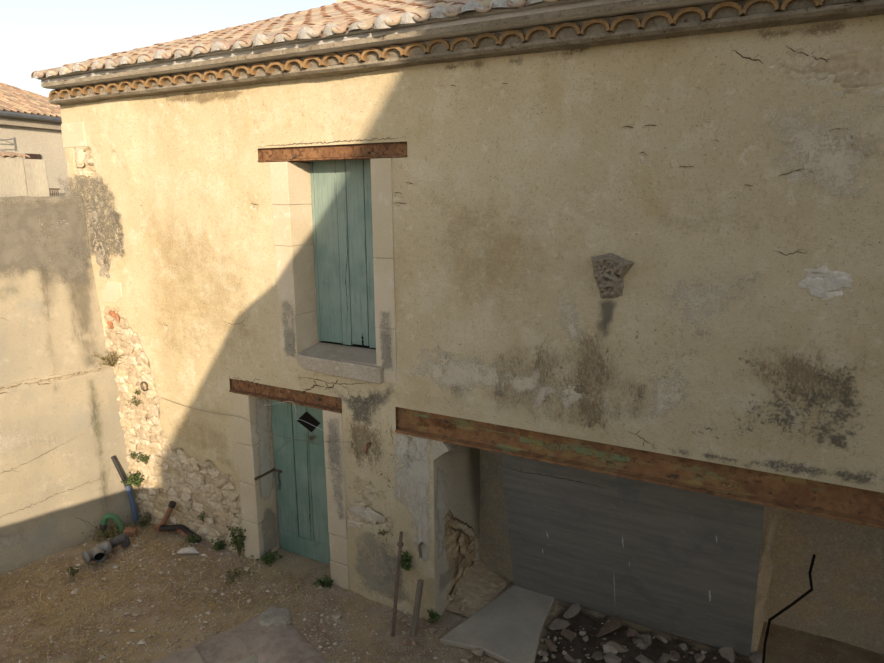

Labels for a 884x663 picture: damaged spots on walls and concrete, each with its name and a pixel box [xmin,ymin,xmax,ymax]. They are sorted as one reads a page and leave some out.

crack [787,47,830,62]
spalling [798,266,853,300]
damp [600,302,614,334]
crack [292,377,364,395]
damp [496,339,670,428]
damp [737,350,862,448]
spalling [103,308,244,548]
crack [0,437,75,474]
crack [2,475,109,517]
spalling [444,510,477,597]